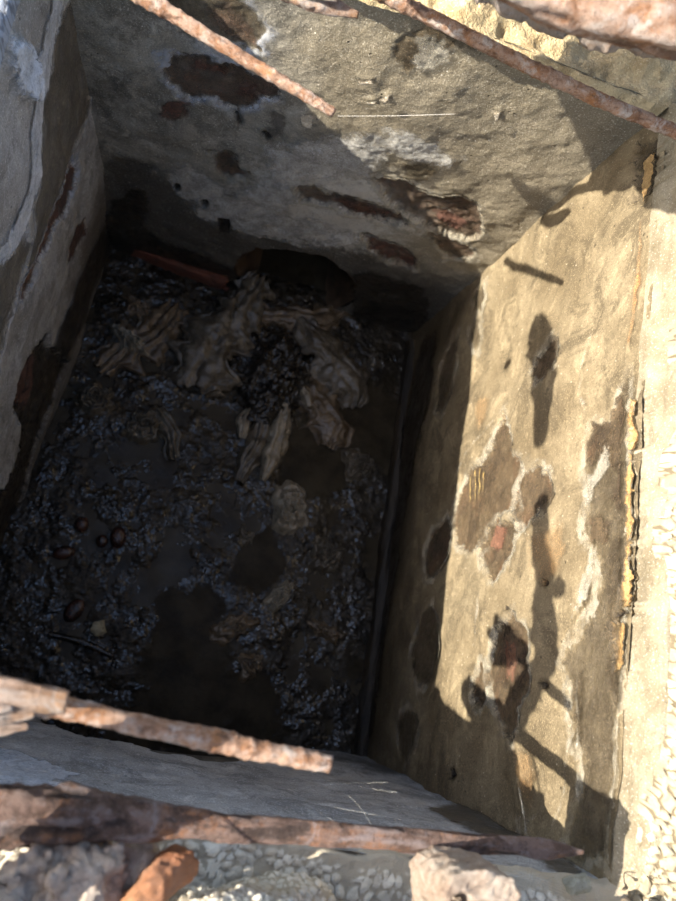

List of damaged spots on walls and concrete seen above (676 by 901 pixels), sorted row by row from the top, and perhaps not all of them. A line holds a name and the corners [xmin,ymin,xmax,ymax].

spalling [130,0,336,128]
spalling [210,149,250,176]
spalling [363,232,416,267]
spalling [298,176,482,258]
spalling [531,336,559,384]
spalling [425,414,555,583]
spalling [472,610,532,743]